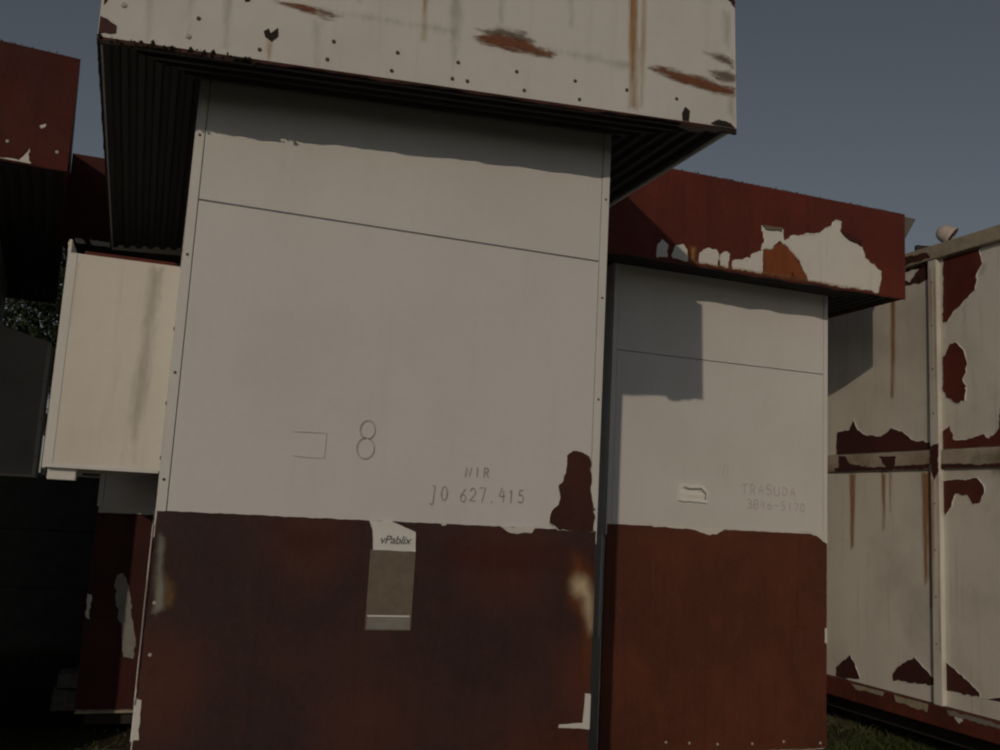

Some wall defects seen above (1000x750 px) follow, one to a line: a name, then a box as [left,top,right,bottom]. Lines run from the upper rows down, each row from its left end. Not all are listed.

rust [281,2,333,20]
rust [85,16,737,266]
peeling [656,220,882,294]
rust [835,415,1000,587]